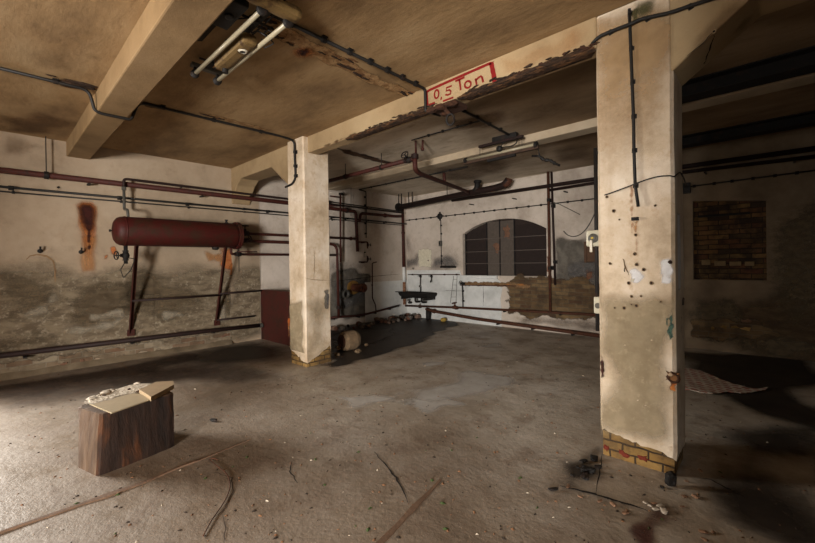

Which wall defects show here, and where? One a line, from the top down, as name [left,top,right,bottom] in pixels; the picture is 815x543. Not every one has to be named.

spalling [257,16,415,97]
spalling [457,42,599,100]
spalling [325,103,437,146]
corrosion [78,203,96,270]
corrosion [206,248,233,275]
peeling [465,257,600,320]
damp [0,267,281,403]
crack [376,453,408,502]